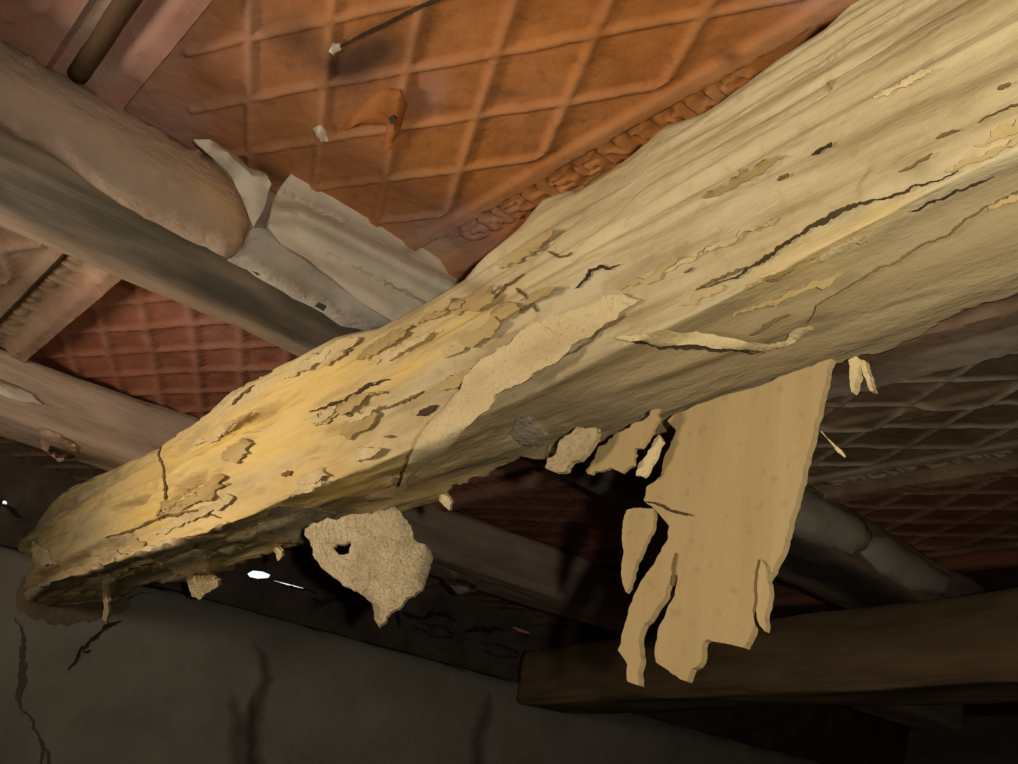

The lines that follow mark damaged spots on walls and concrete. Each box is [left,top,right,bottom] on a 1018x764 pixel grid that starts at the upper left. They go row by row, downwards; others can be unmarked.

crack [548,251,620,289]
crack [564,82,1018,357]
peeling [81,242,717,628]
crack [14,617,51,764]
crack [68,592,148,670]